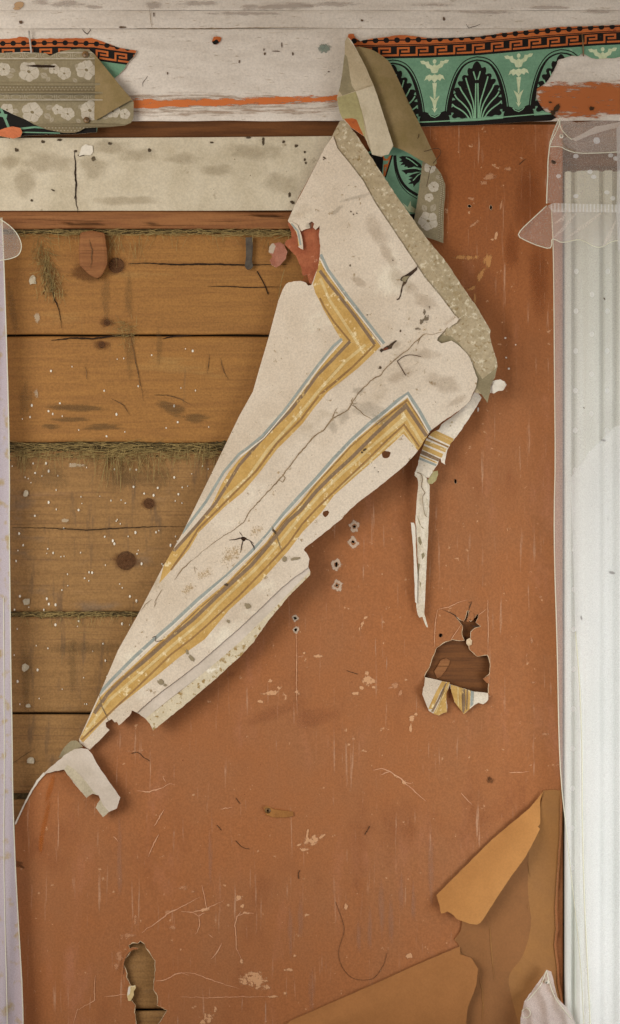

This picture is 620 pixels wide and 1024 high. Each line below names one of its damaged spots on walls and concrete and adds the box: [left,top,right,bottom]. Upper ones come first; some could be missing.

peeling [537,82,620,118]
crack [74,144,93,212]
crack [43,265,187,414]
crack [130,263,286,288]
peeling [79,37,510,749]
crack [142,332,441,609]